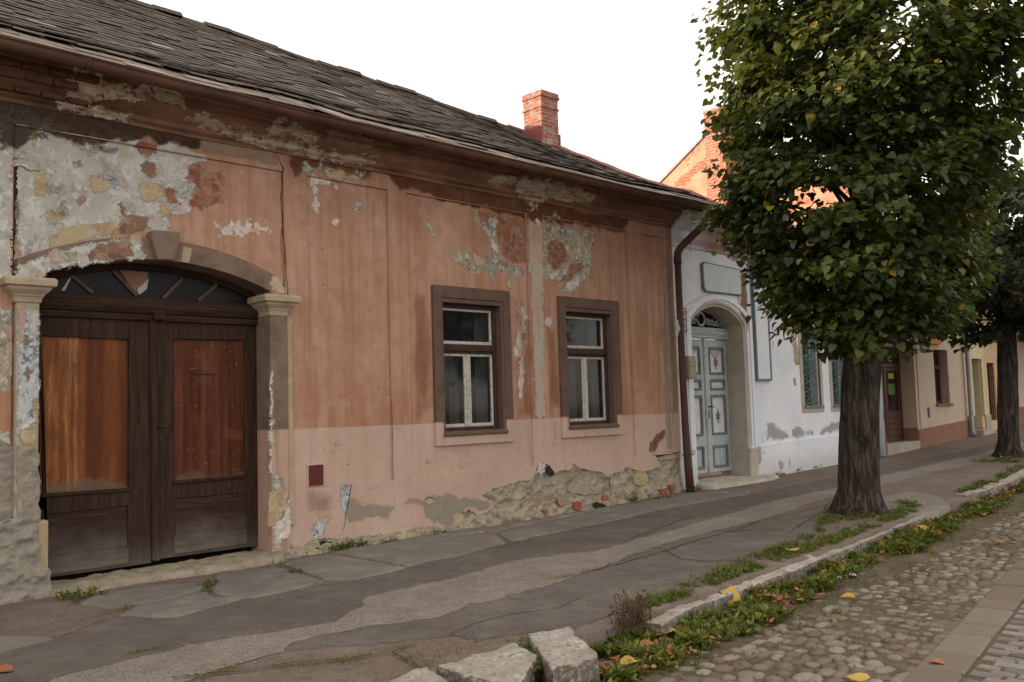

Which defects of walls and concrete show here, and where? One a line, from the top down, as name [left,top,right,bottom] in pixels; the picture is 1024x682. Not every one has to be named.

peeling [0,124,226,278]
flaking render [0,50,381,226]
peeling [213,215,272,239]
peeling [449,173,597,418]
peeling [0,306,41,523]
flaking render [267,371,683,559]